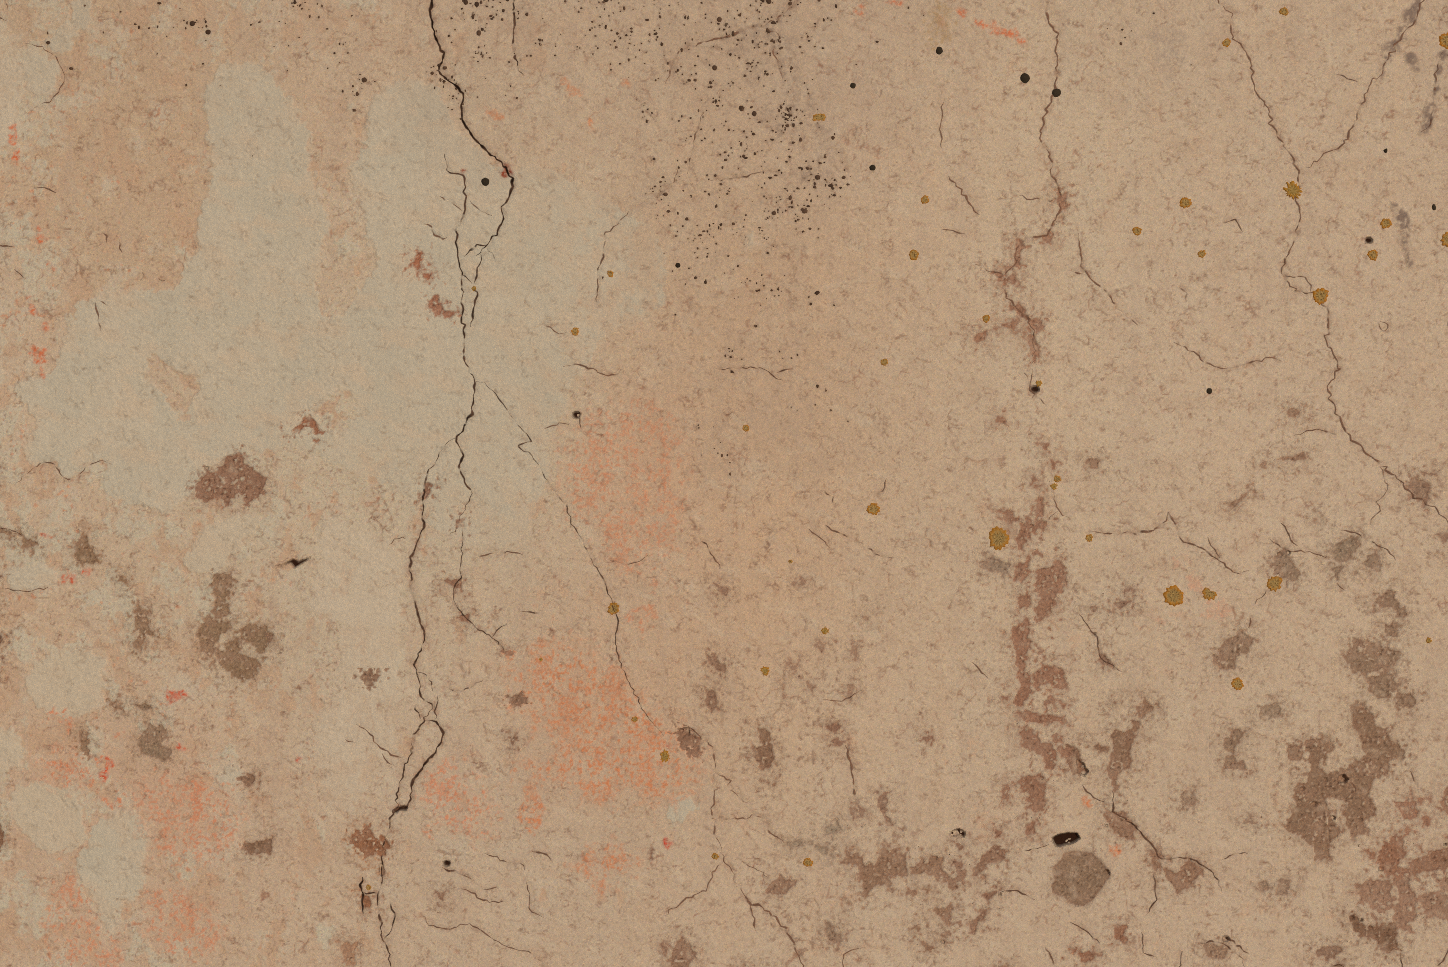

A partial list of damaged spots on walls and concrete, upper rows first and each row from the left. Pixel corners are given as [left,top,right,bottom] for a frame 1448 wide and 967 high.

peeling [0,517,285,773]
peeling [0,97,645,552]
crack [346,0,581,966]
water stain [0,0,1019,497]
spalling [650,924,708,967]
crack [567,506,804,967]
spalling [663,404,1215,967]
spalling [960,179,1079,377]
crack [976,12,1138,404]
crack [1049,496,1266,627]
spalling [1167,506,1448,967]
crack [1218,0,1448,589]